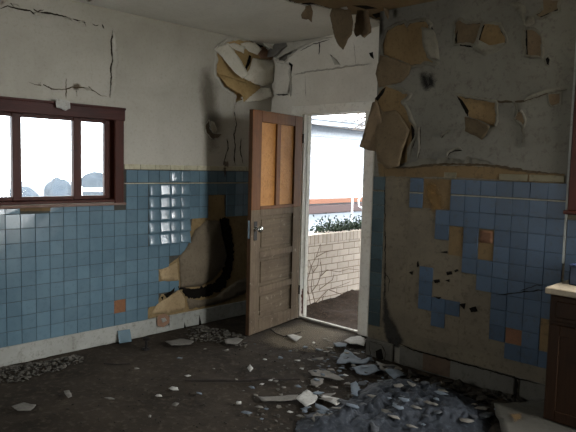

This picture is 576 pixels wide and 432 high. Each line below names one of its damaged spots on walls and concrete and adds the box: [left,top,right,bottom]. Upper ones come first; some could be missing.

crack [0,3,119,98]
peeling [214,37,332,105]
crack [223,101,243,165]
peeling [369,17,565,353]
peeling [148,195,248,322]